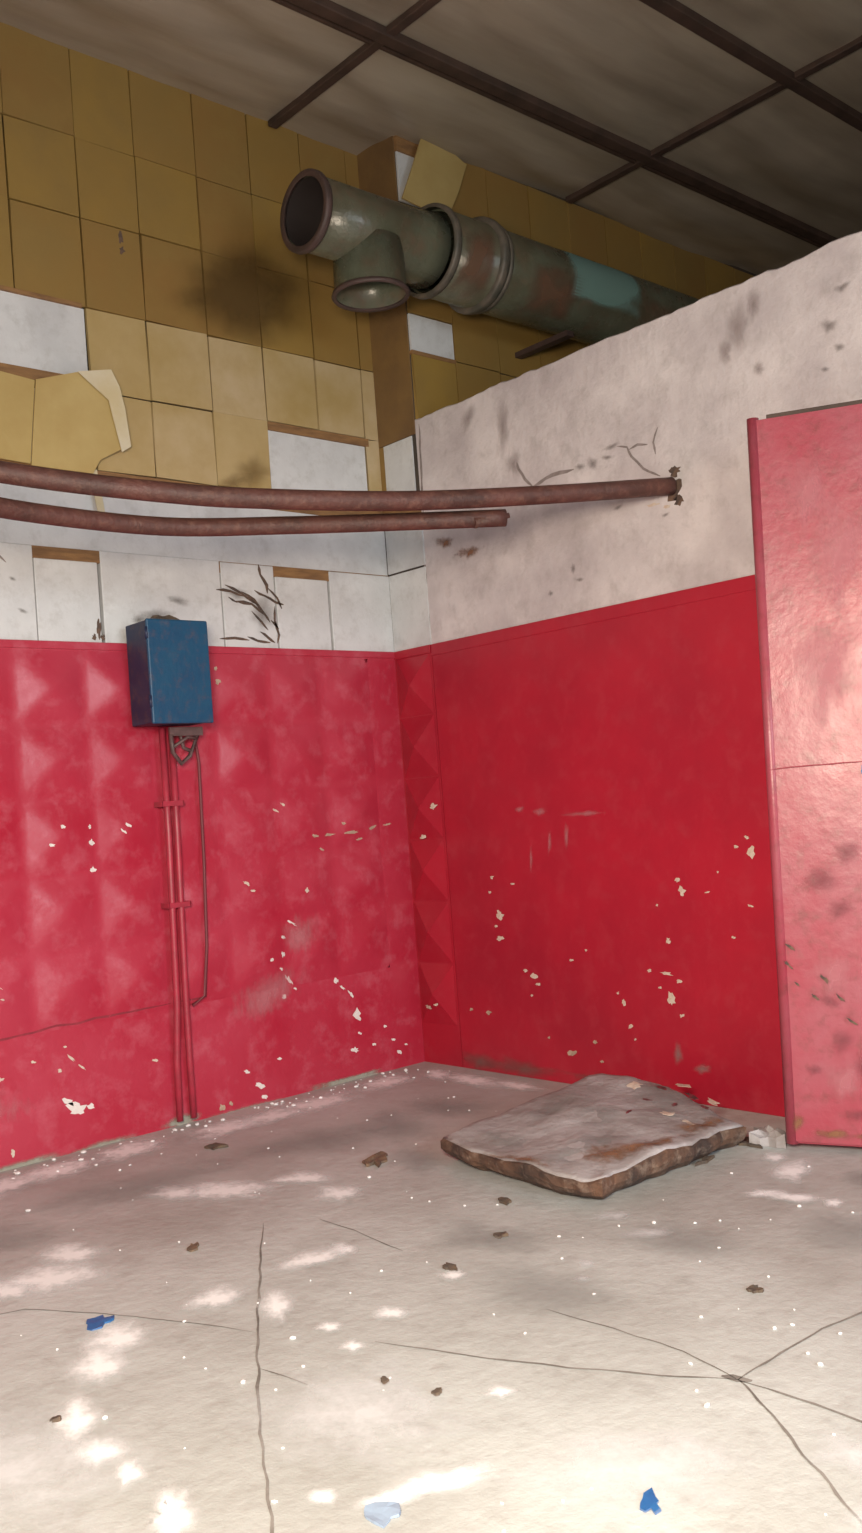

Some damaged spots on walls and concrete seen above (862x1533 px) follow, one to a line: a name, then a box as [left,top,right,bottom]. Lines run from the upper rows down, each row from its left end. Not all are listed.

rust [460,238,493,288]
crack [516,462,574,486]
crack [617,427,660,476]
peeling [312,822,390,851]
peeling [270,920,297,999]
peeling [334,978,407,1054]
peeling [647,969,685,1018]
crack [318,1218,403,1251]
crack [2,1225,308,1533]
crack [375,1309,862,1524]